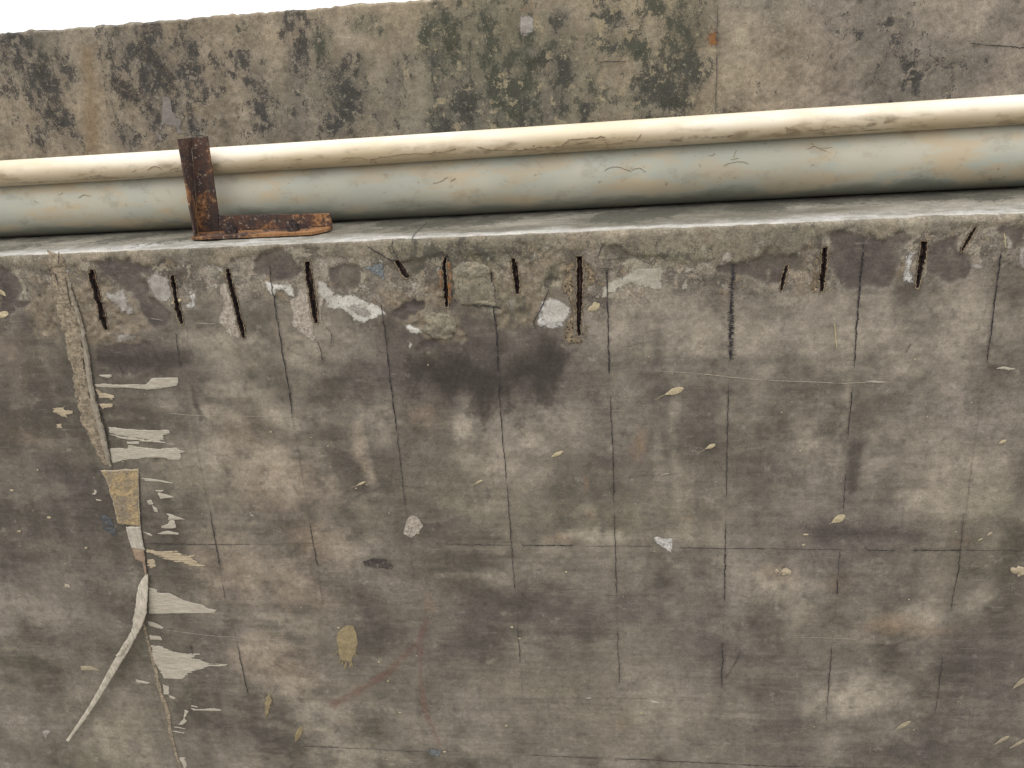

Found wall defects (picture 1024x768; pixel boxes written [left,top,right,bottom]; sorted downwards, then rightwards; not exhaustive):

leakage [109,70,144,105]
peeling [105,289,133,315]
peeling [148,273,171,302]
spalling [219,283,240,338]
spalling [289,287,325,342]
peeling [537,261,664,344]
spalling [47,250,108,465]
crack [448,245,657,700]
crack [688,245,864,721]